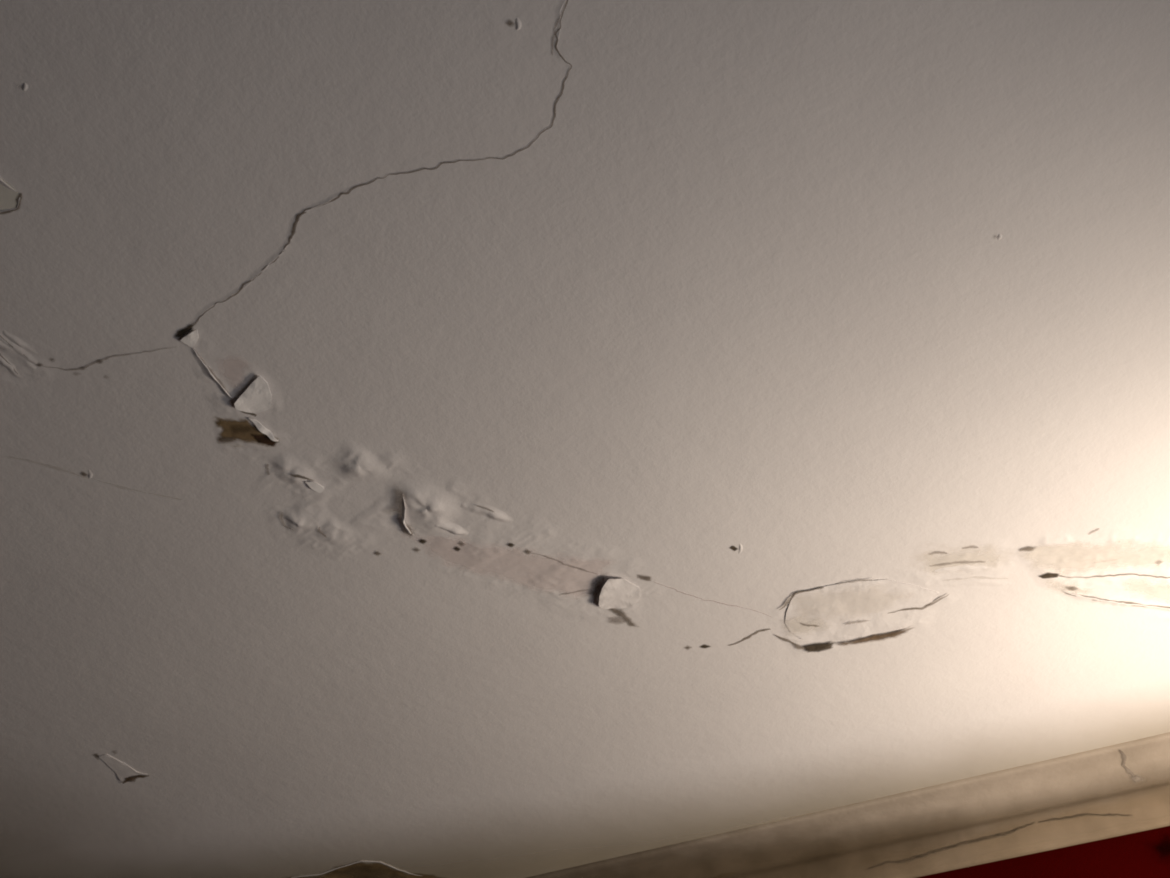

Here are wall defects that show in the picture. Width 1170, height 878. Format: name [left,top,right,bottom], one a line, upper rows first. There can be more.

peeling [0,178,22,214]
crack [186,0,572,328]
crack [38,348,166,370]
peeling [415,503,668,626]
spalling [728,562,965,657]
peeling [1006,523,1170,623]
peeling [95,754,148,784]